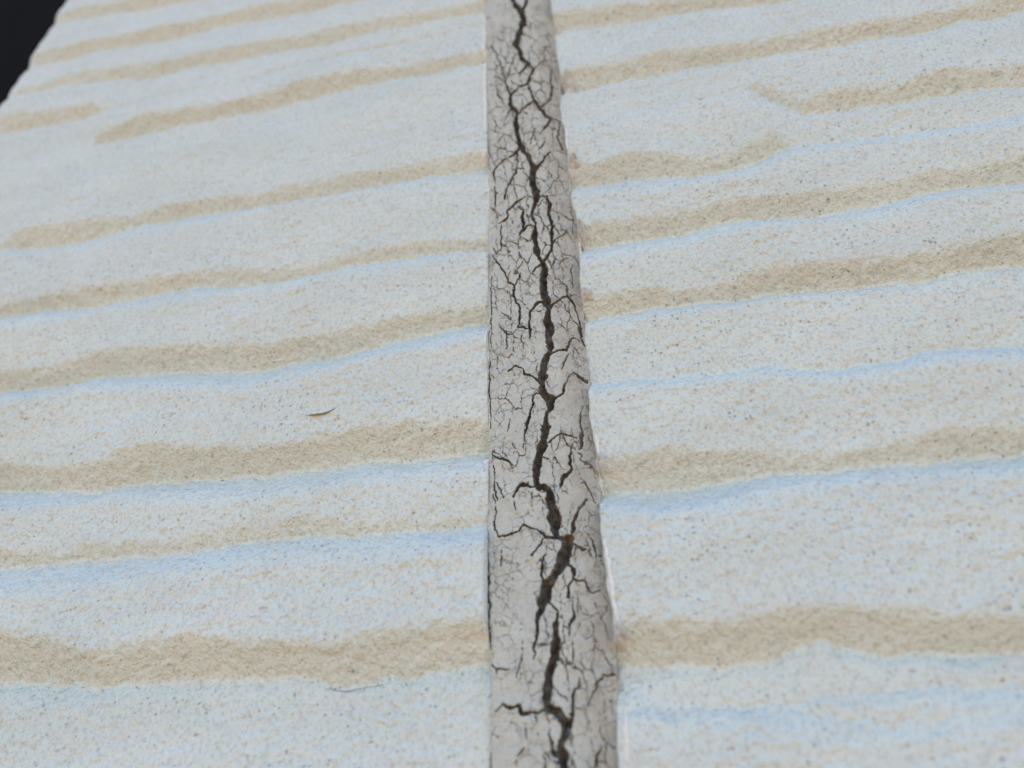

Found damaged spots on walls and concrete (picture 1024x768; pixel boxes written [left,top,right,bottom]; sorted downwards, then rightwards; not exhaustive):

crack [487,0,617,768]